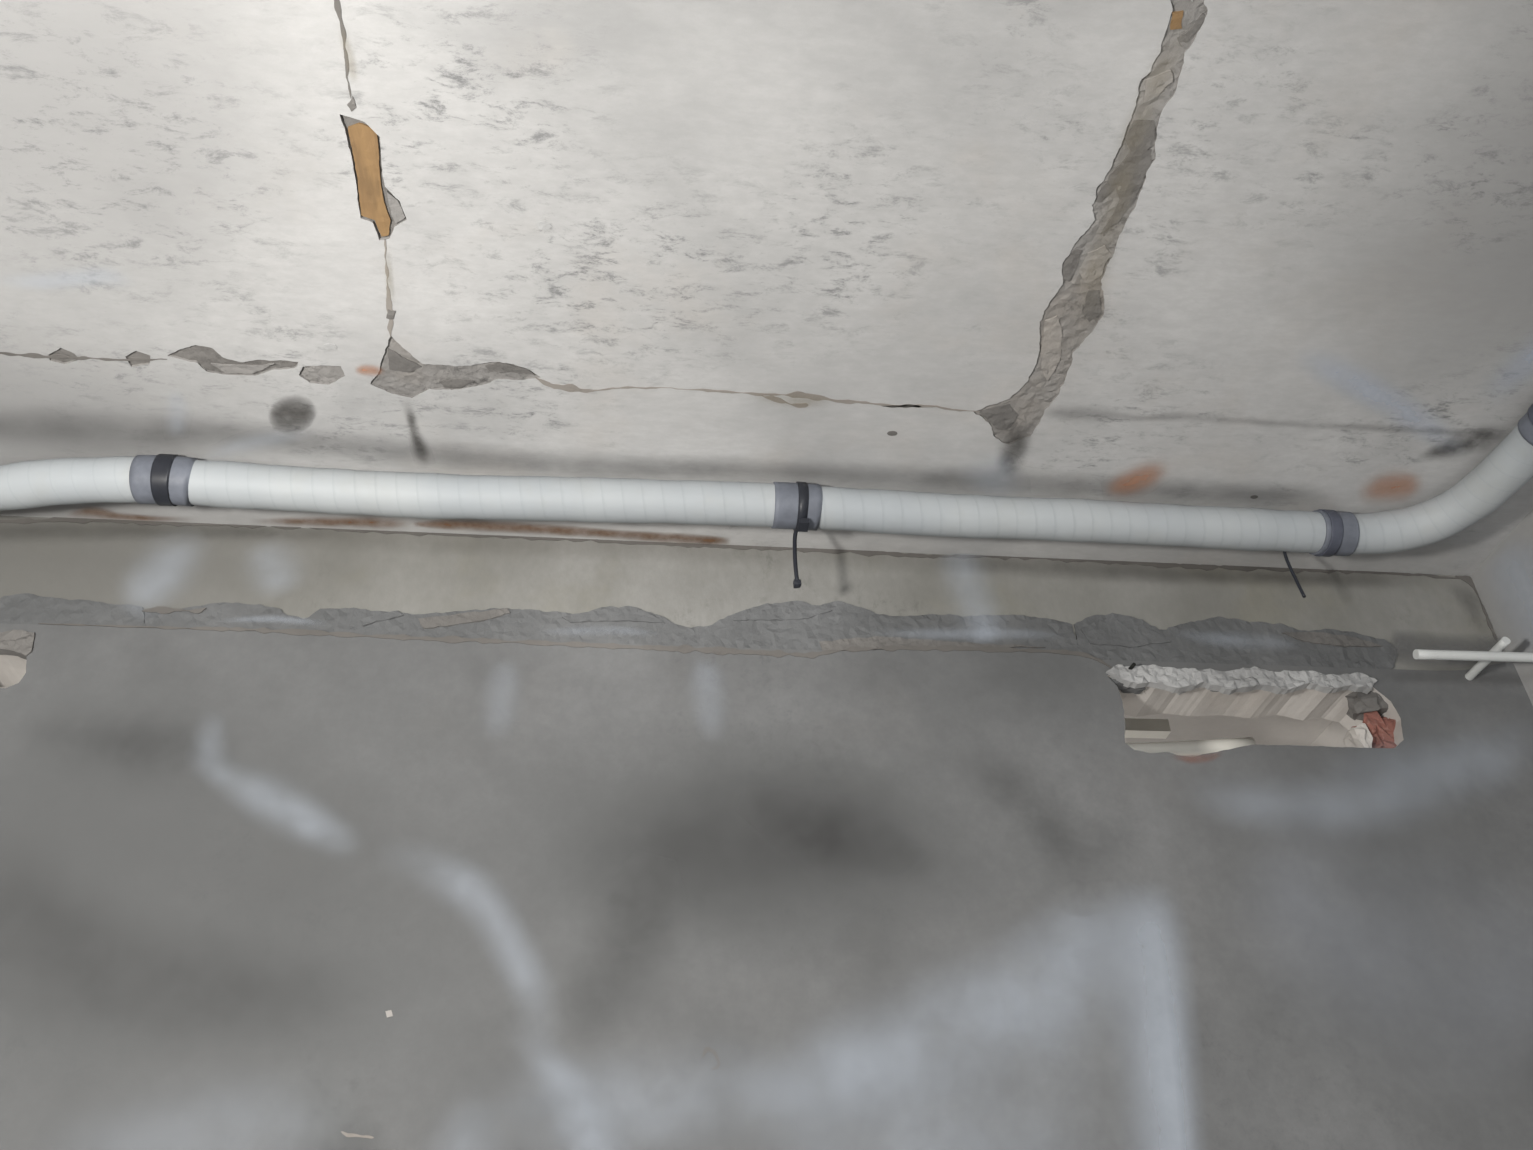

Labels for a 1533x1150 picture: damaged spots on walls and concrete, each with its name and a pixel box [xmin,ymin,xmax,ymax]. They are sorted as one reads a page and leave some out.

crack [334,0,351,98]
peeling [387,191,405,223]
crack [384,239,395,338]
crack [0,352,167,361]
crack [535,377,980,412]
spalling [1106,664,1397,748]